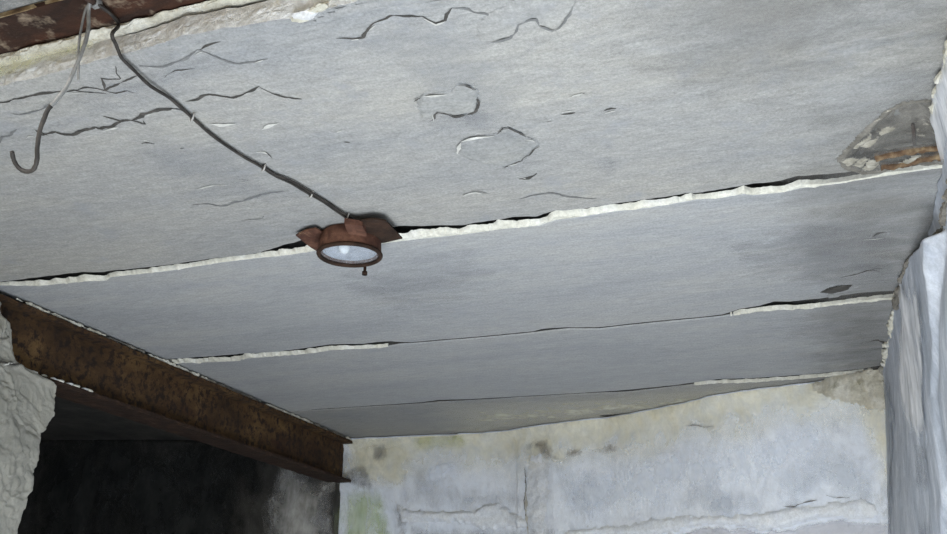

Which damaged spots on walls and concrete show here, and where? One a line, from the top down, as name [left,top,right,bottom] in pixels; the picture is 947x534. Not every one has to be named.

crack [337,7,489,41]
crack [0,41,298,143]
spalling [837,29,947,175]
crack [195,185,283,221]
crack [521,191,594,199]
flaking render [932,179,947,235]
flaking render [879,258,909,376]
water stain [34,440,257,534]